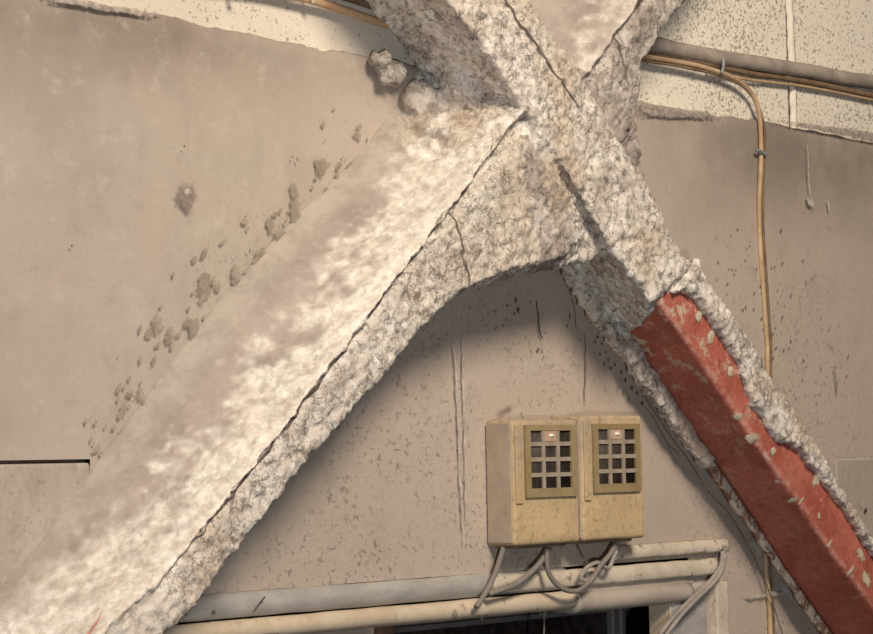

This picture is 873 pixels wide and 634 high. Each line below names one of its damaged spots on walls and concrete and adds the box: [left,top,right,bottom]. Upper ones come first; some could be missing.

crack [186,135,504,551]
peeling [846,548,871,587]